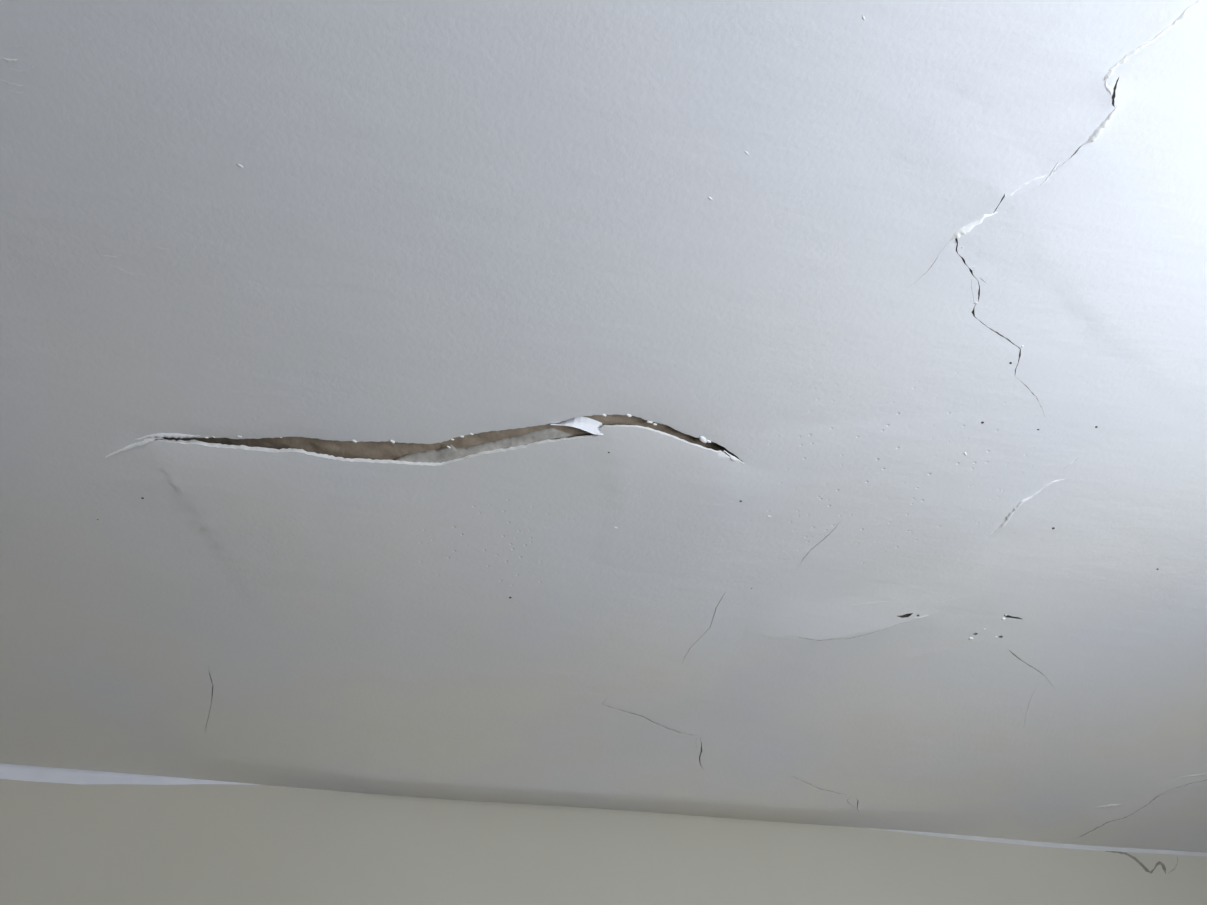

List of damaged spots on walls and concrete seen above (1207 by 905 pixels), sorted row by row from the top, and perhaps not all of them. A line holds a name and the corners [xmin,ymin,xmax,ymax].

crack [919,0,1202,416]
crack [105,414,745,466]